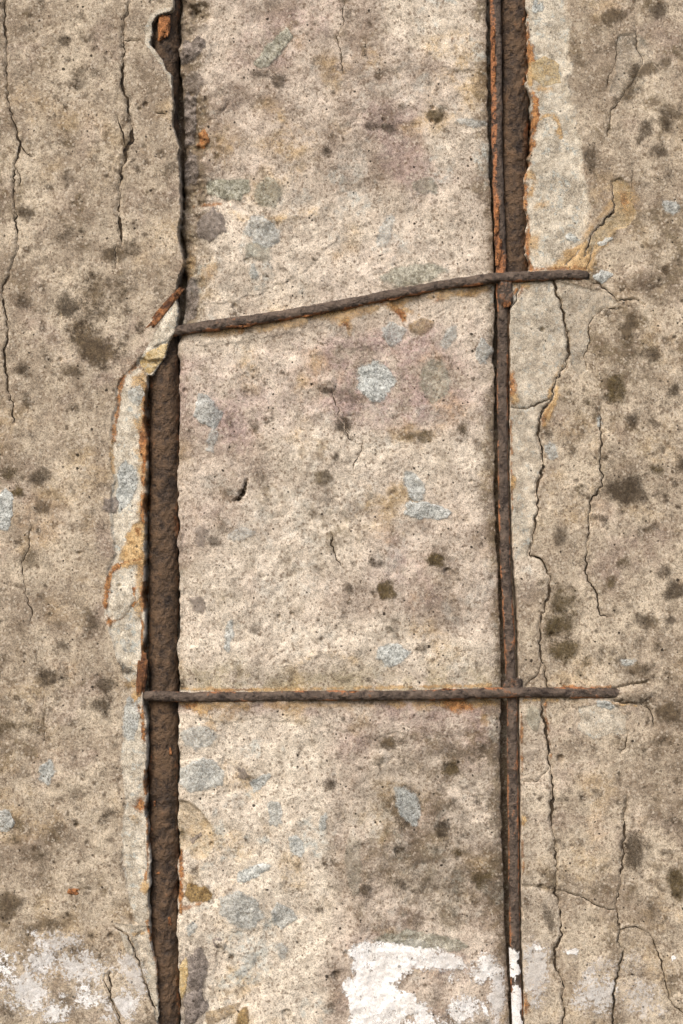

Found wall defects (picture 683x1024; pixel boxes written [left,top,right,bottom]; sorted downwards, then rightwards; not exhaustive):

crack [114,0,135,268]
spalling [145,7,173,88]
crack [607,27,643,136]
crack [2,0,32,423]
rust [494,203,502,267]
rust [380,297,411,322]
spalling [104,301,186,685]
crack [517,171,683,1024]
rust [248,683,492,712]
spalling [121,714,149,926]
rust [134,770,161,893]
peeling [573,969,618,1014]